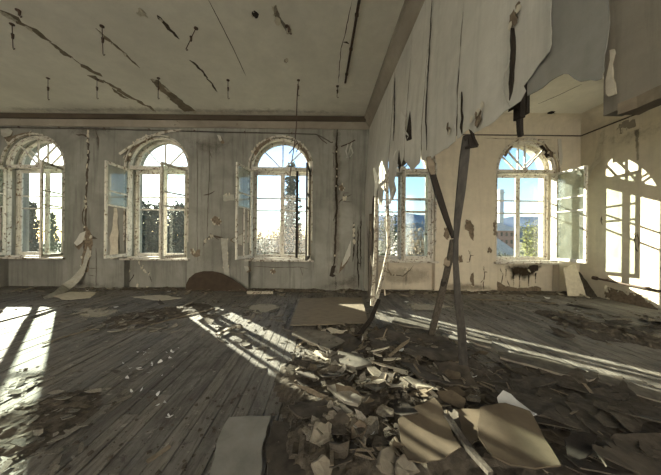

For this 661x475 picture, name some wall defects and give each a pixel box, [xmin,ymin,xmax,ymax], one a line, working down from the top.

crack [157,15,179,39]
peeling [508,1,521,31]
crack [0,10,156,112]
crack [189,60,217,92]
peeling [469,101,484,128]
peeling [539,139,563,172]
crack [76,129,99,276]
crack [330,129,362,288]
spalling [464,219,475,240]
spalling [74,226,93,273]
leakage [506,265,541,287]